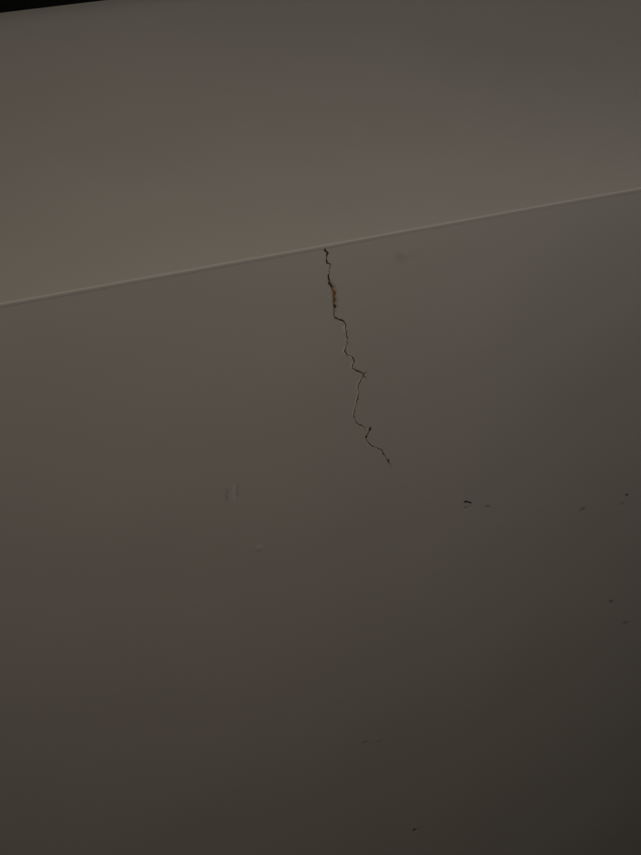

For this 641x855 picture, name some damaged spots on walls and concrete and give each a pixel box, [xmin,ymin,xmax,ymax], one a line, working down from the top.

crack [324,249,391,466]